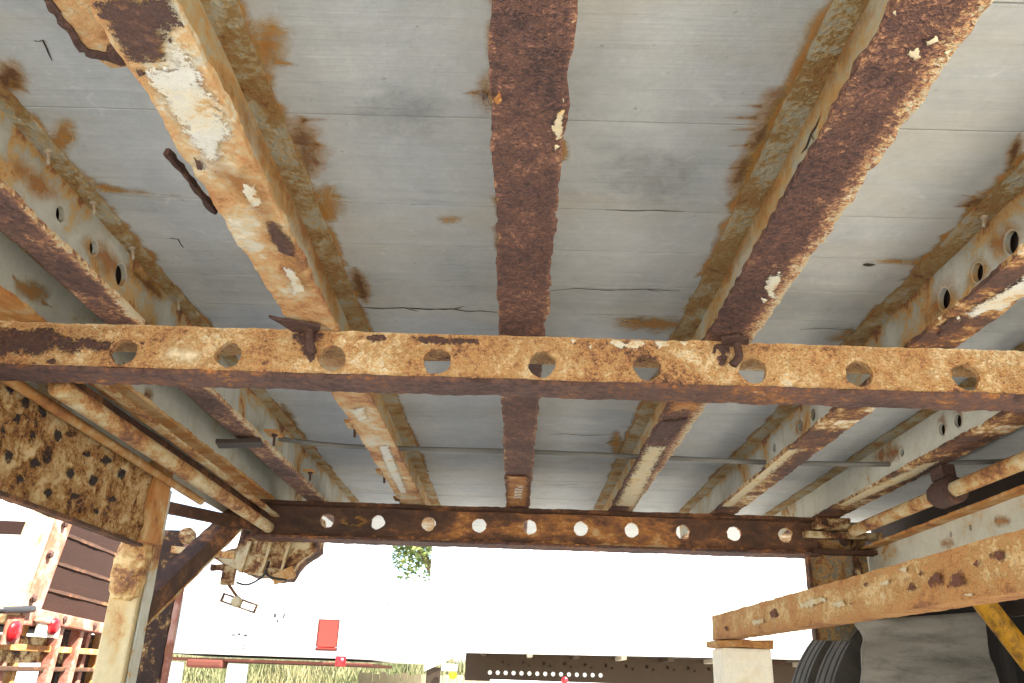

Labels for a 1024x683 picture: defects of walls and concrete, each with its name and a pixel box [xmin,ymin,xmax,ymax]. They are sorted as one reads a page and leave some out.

peeling [91,0,235,162]
rust [695,1,833,288]
rust [213,170,271,220]
peeling [242,182,264,207]
rust [277,103,372,332]
rust [881,139,1024,280]
crack [553,286,670,294]
peeling [761,272,781,304]
crack [363,305,498,313]
rust [621,318,680,340]
rust [292,332,324,362]
rust [712,344,733,366]